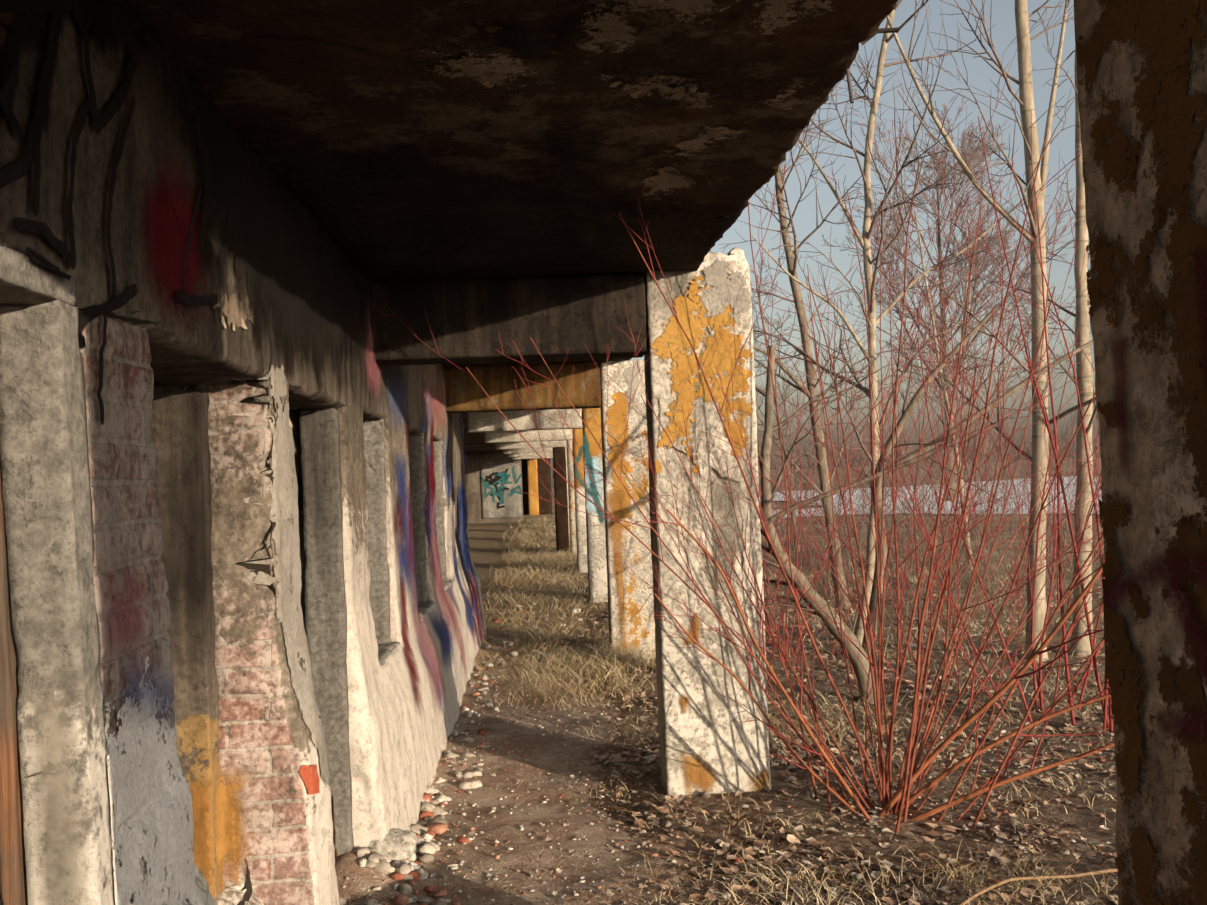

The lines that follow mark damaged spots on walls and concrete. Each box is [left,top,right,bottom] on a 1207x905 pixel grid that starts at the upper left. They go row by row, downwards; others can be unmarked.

peeling [420,40,539,91]
peeling [568,0,837,201]
peeling [585,258,754,520]
peeling [1076,0,1207,905]
crack [237,858,253,905]